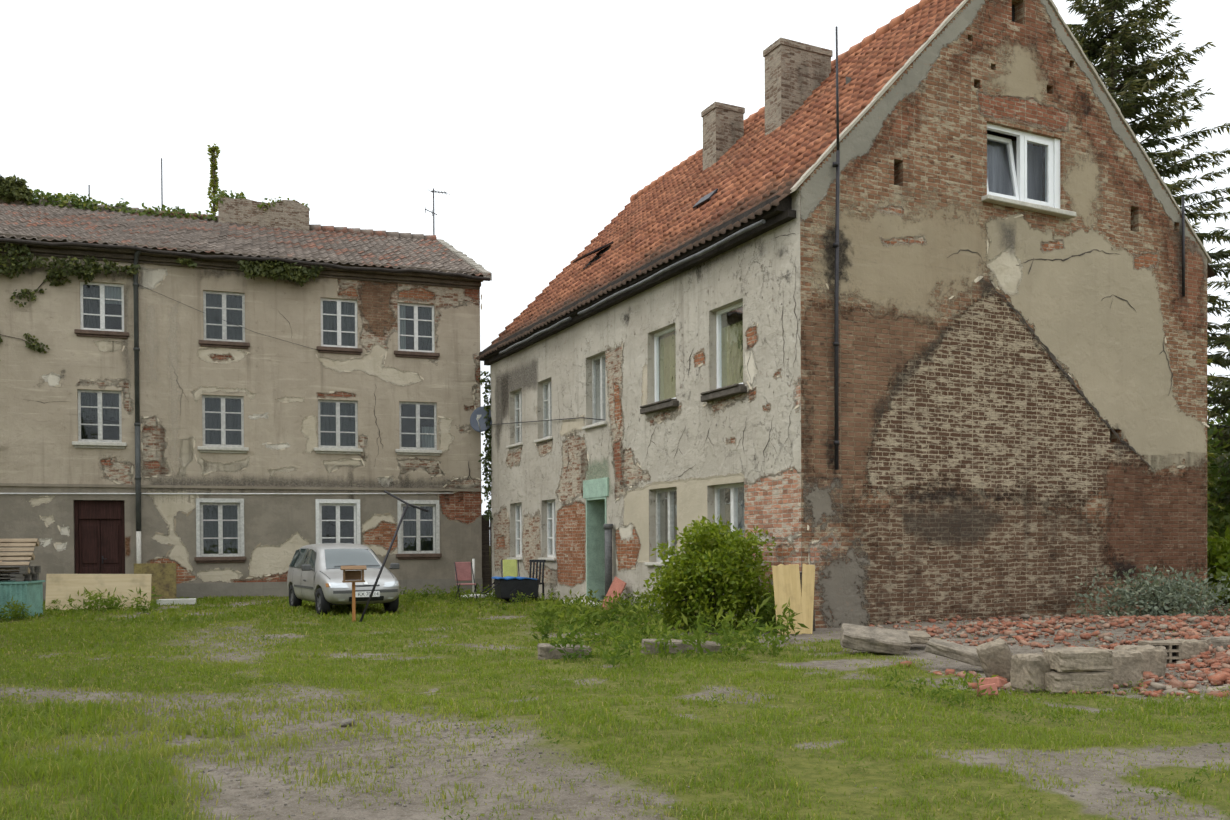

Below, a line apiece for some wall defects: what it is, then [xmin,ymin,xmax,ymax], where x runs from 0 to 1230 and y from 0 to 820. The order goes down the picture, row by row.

spalling [42,371,64,387]
spalling [76,377,310,584]
spalling [191,386,368,473]
spalling [316,279,483,387]
spalling [377,353,589,590]
spalling [703,322,771,415]
flaking render [743,0,1210,626]
crack [947,249,1153,469]
spalling [361,513,398,557]
spalling [615,522,641,572]